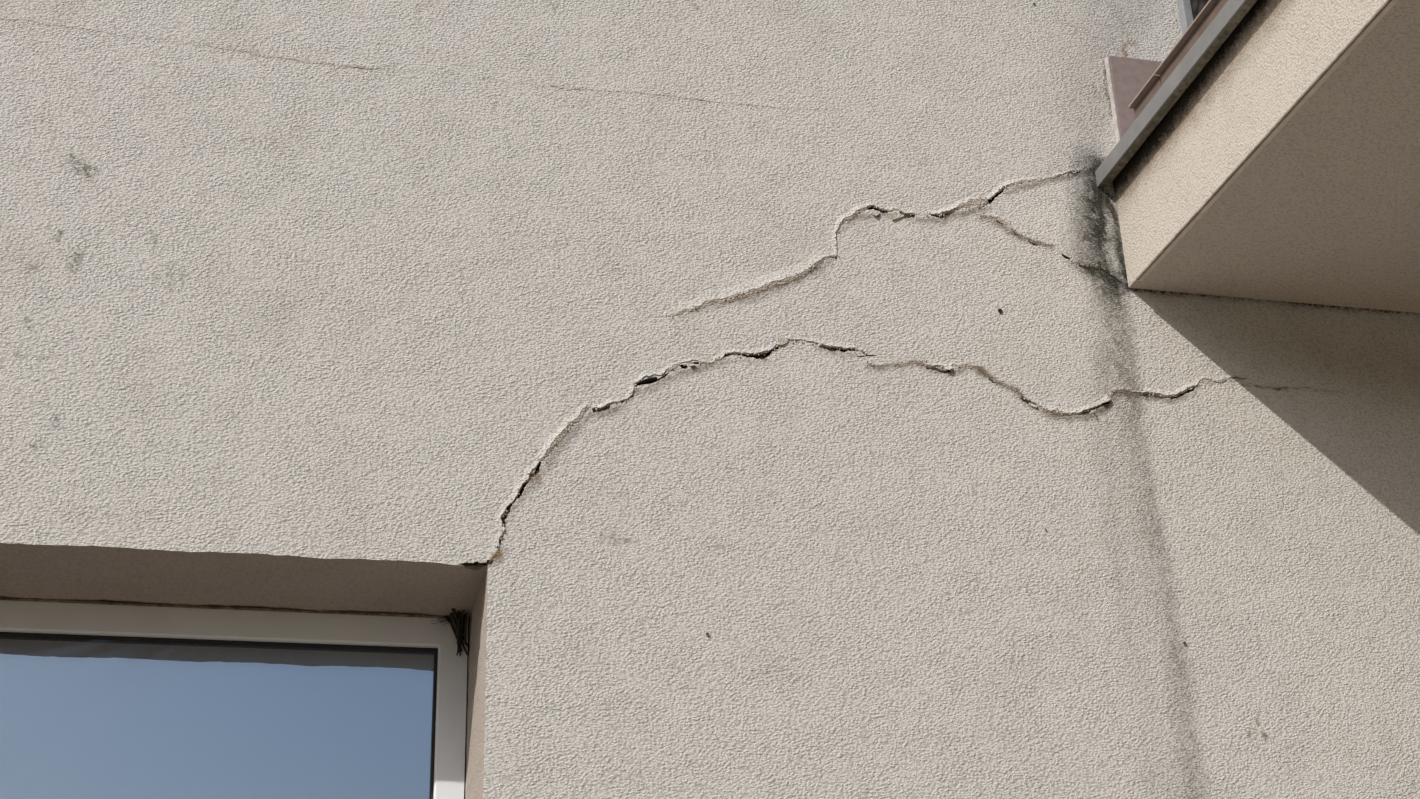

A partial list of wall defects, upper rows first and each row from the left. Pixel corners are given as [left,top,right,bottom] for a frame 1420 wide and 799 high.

crack [663,166,1122,318]
water stain [1078,158,1138,416]
crack [460,336,1326,570]